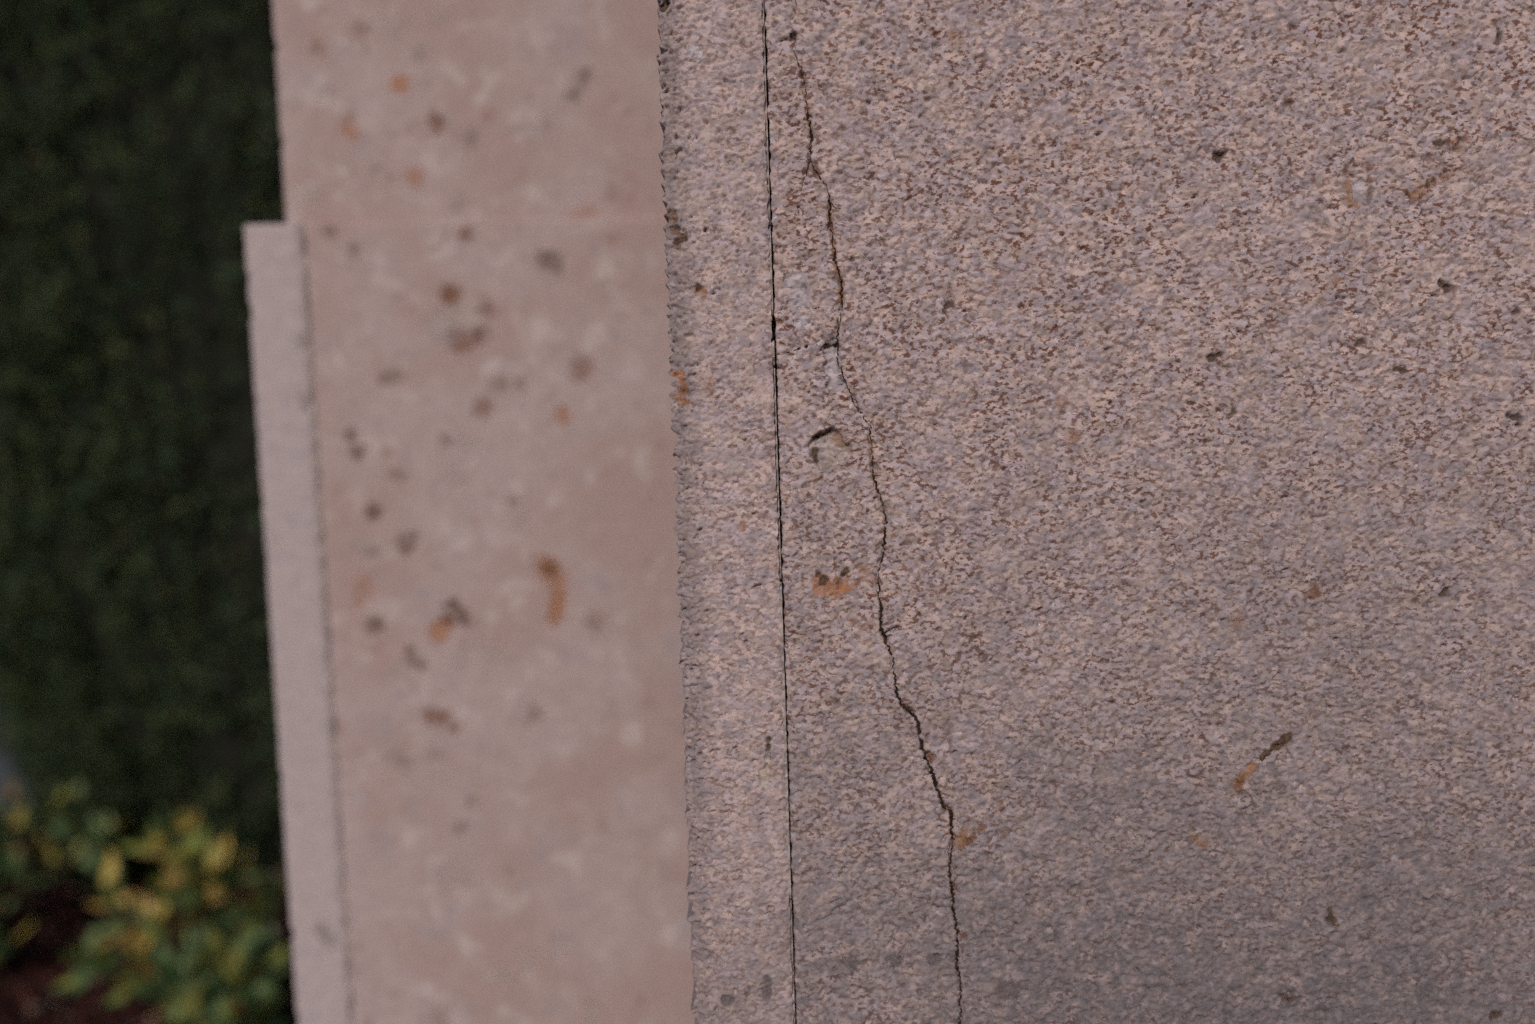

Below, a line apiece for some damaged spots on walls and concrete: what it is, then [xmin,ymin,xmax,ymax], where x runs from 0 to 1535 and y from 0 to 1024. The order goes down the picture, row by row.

crack [780,0,965,1024]
corrosion [813,558,860,597]
corrosion [1234,732,1292,787]